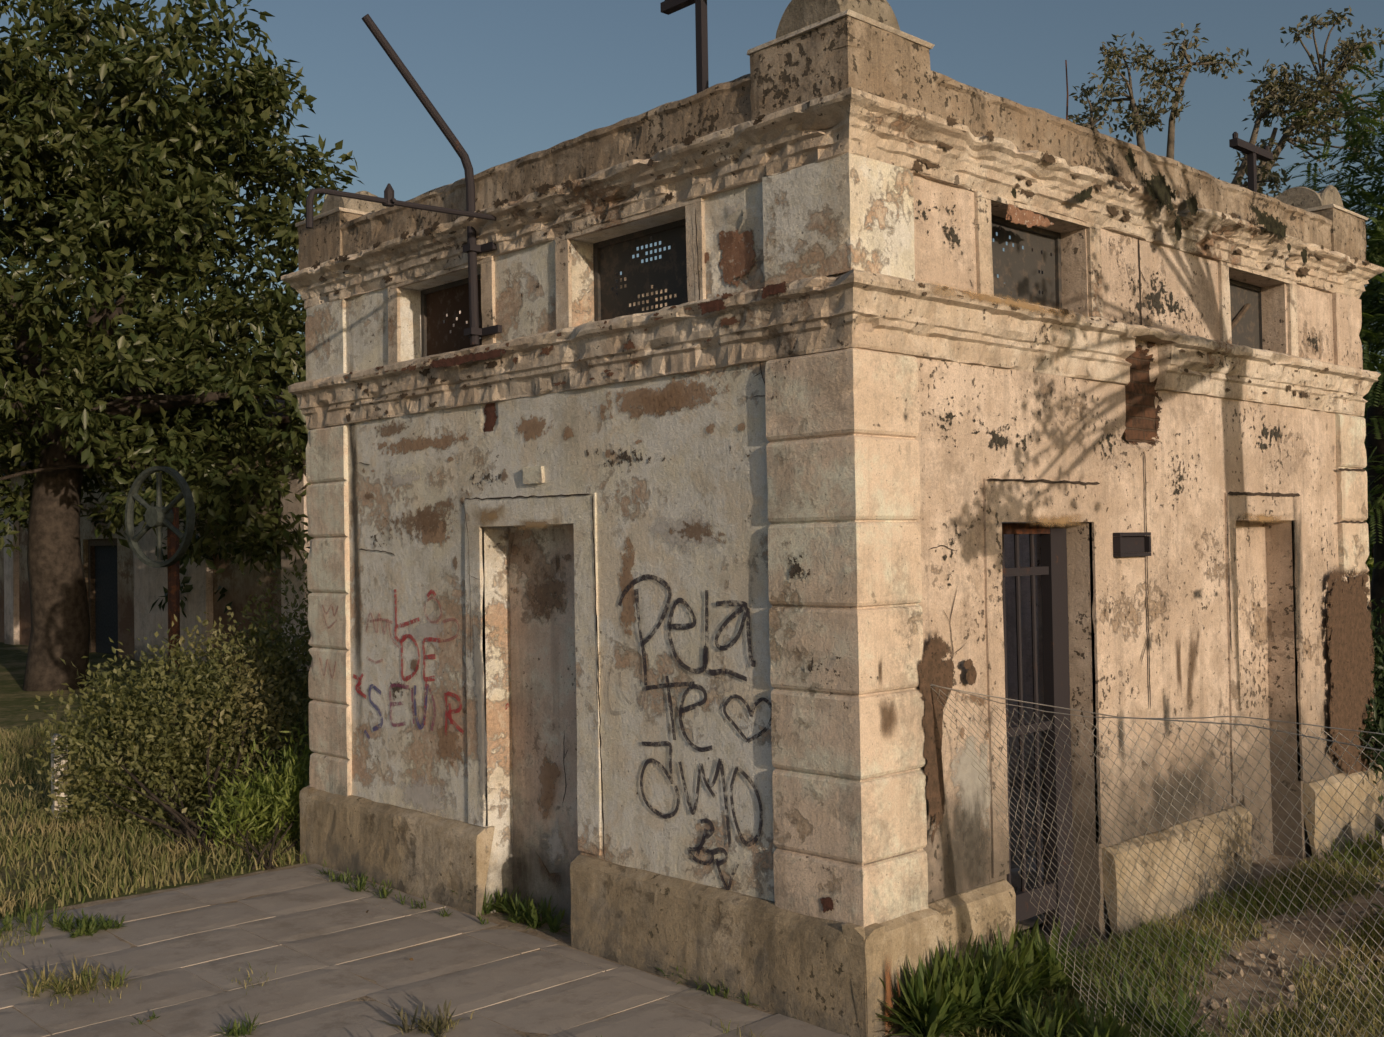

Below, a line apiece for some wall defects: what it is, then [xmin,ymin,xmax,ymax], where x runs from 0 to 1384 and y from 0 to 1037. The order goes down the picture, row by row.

spalling [623,229,758,365]
spalling [762,281,787,299]
flaking render [1114,268,1193,332]
peeling [345,343,520,461]
peeling [516,414,672,471]
peeling [588,377,729,421]
spalling [1099,339,1162,478]
flaking render [1240,424,1299,454]
peeling [370,469,508,570]
peeling [510,545,570,622]